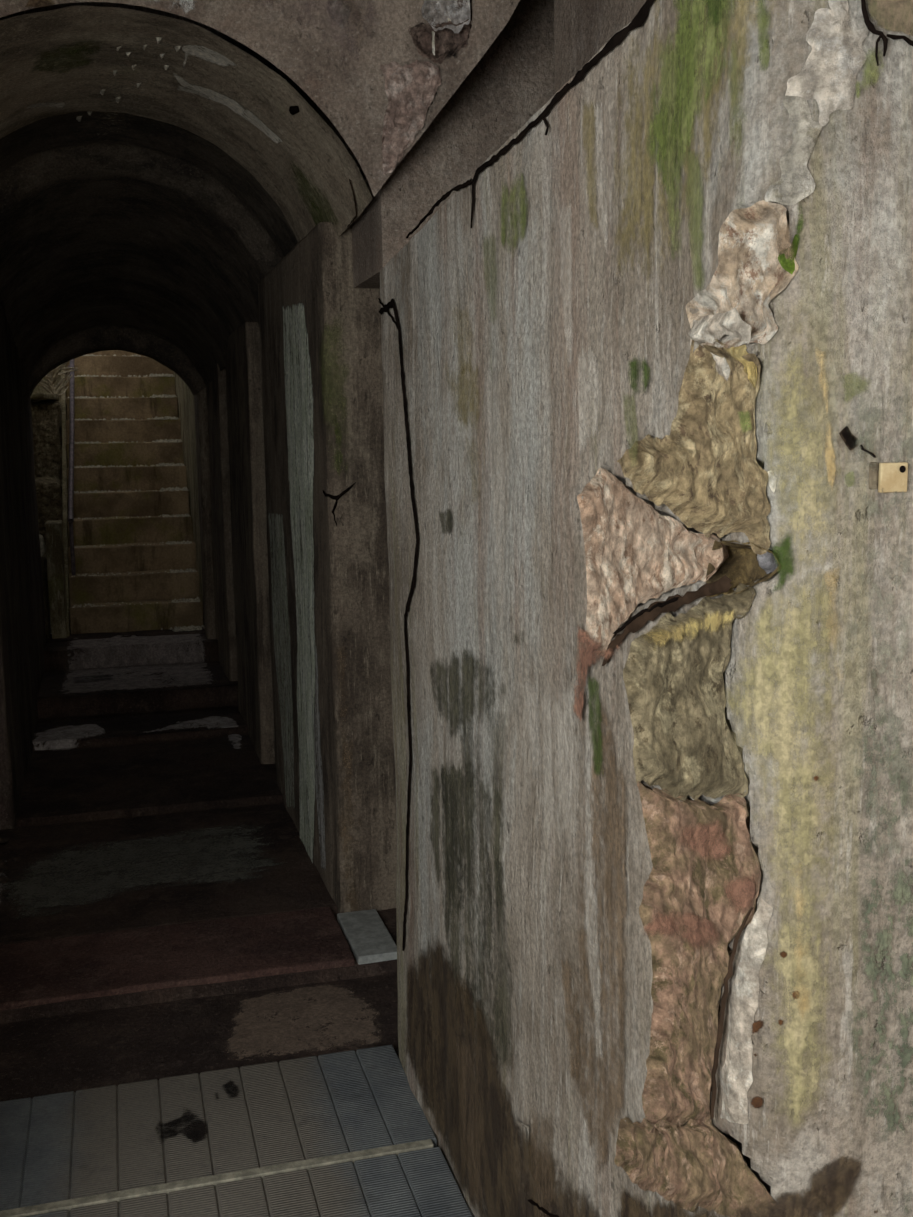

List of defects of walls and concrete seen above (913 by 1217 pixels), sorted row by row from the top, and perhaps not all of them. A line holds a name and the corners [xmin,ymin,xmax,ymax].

crack [861,0,913,66]
crack [406,0,654,238]
crack [347,179,357,227]
leakage [439,509,452,533]
leakage [282,303,361,912]
spalling [574,0,869,1217]
leakage [430,652,504,738]
leakage [561,679,627,1168]
leakage [406,763,597,1217]
crack [528,1199,559,1217]
leakage [619,1191,712,1217]
leakage [736,1156,861,1217]